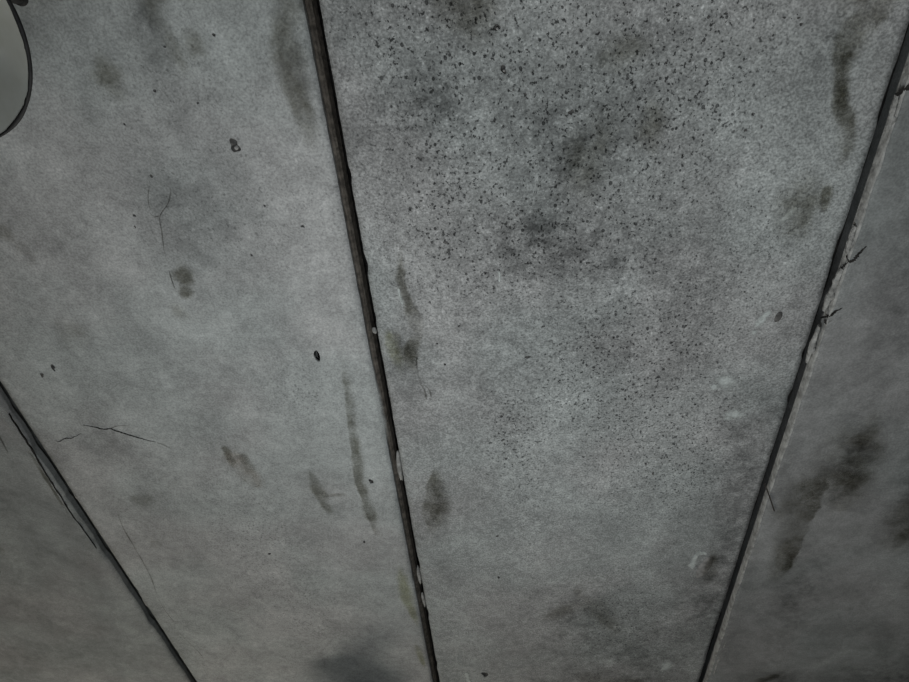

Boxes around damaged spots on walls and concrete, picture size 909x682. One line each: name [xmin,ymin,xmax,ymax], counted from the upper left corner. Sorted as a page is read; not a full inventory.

crack [57,425,154,442]